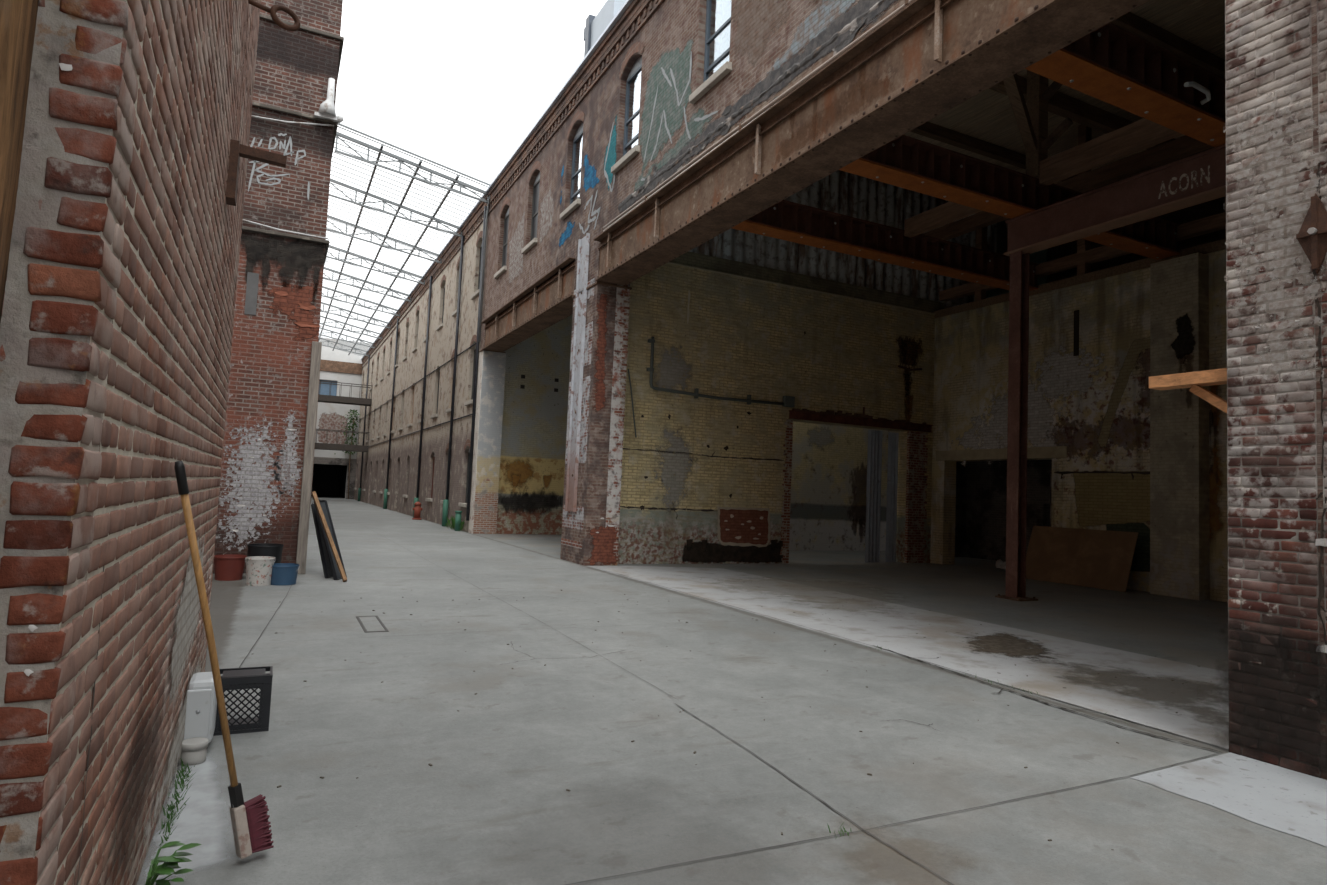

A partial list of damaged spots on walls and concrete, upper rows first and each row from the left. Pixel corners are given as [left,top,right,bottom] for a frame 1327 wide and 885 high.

leakage [244,235,327,305]
spalling [592,292,630,417]
spalling [1027,349,1150,465]
flaking render [717,494,770,547]
leakage [1223,631,1327,773]